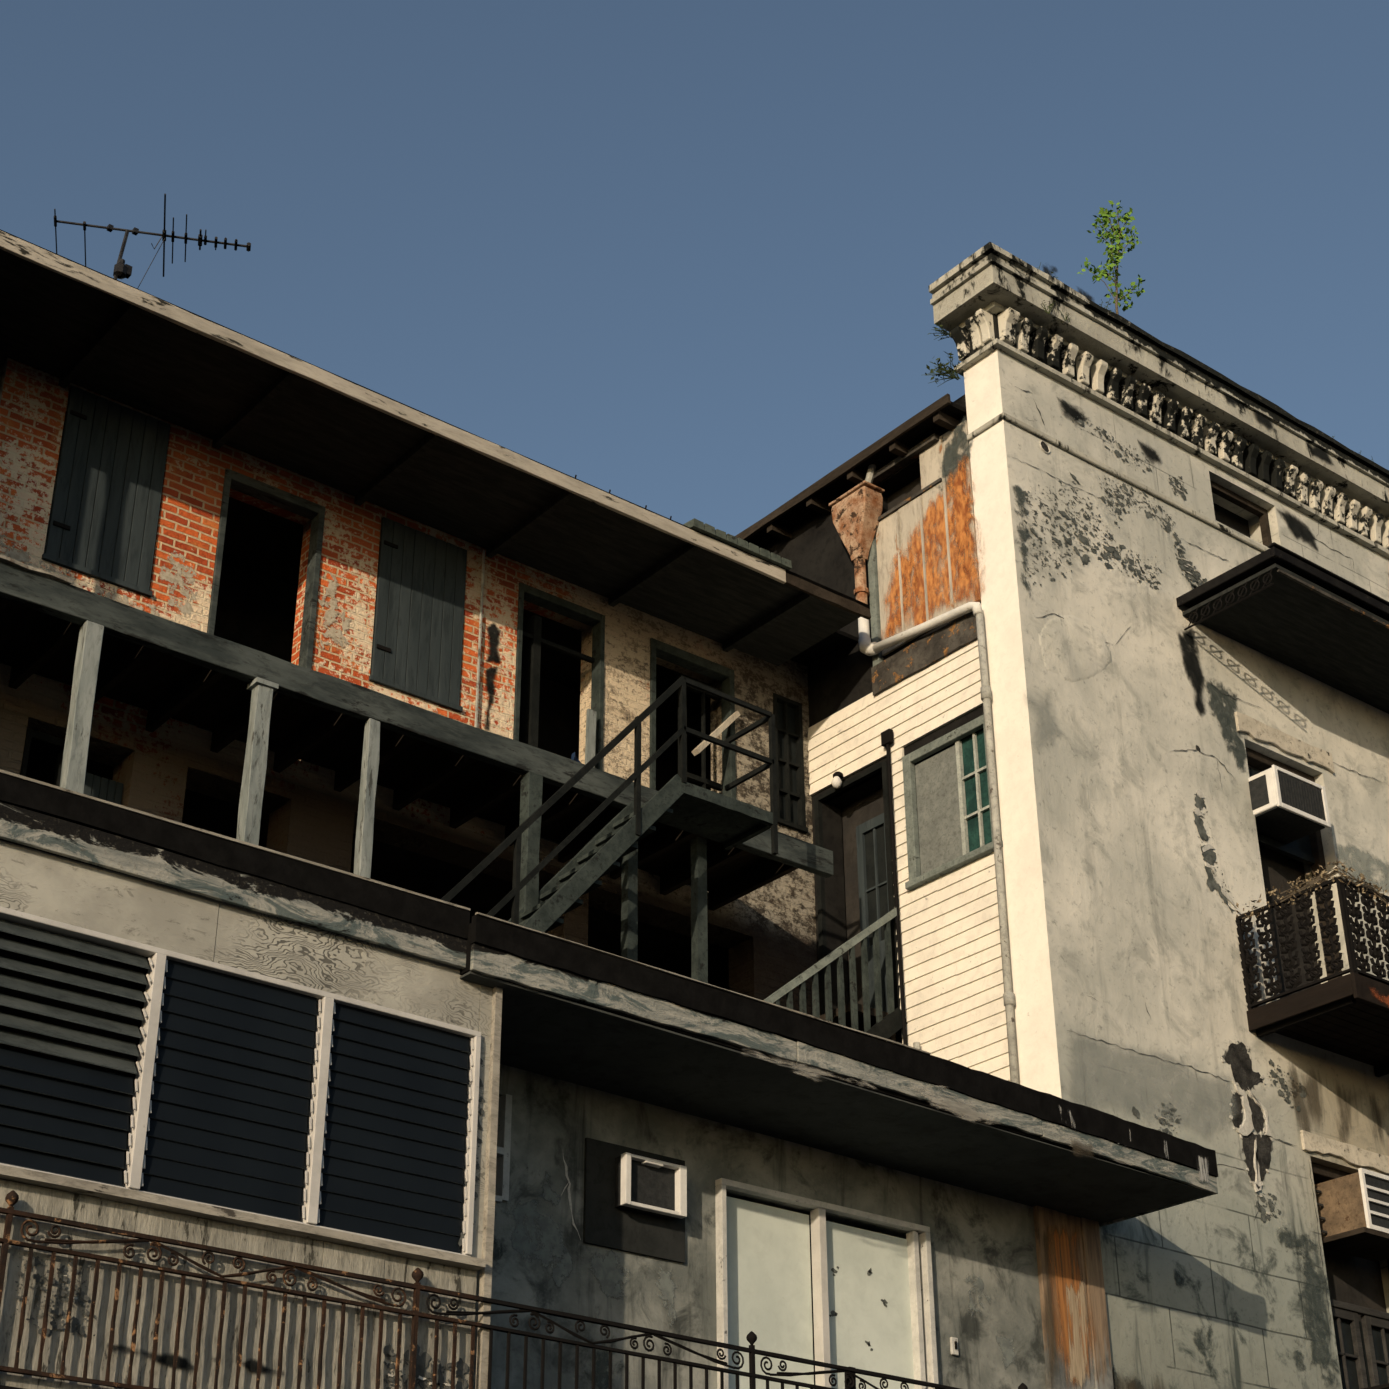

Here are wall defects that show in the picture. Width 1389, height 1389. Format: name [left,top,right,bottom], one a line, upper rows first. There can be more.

rust [885,461,980,637]
peeling [1021,415,1207,590]
damp [1178,629,1247,770]
flaking render [1193,790,1237,913]
rust [1371,988,1389,1006]
damp [108,1345,194,1370]
damp [493,1238,505,1261]
crack [561,1156,581,1240]
peeling [920,1086,996,1121]
rust [1048,1226,1091,1389]
flaking render [1221,1040,1307,1222]
damp [1279,1228,1339,1385]